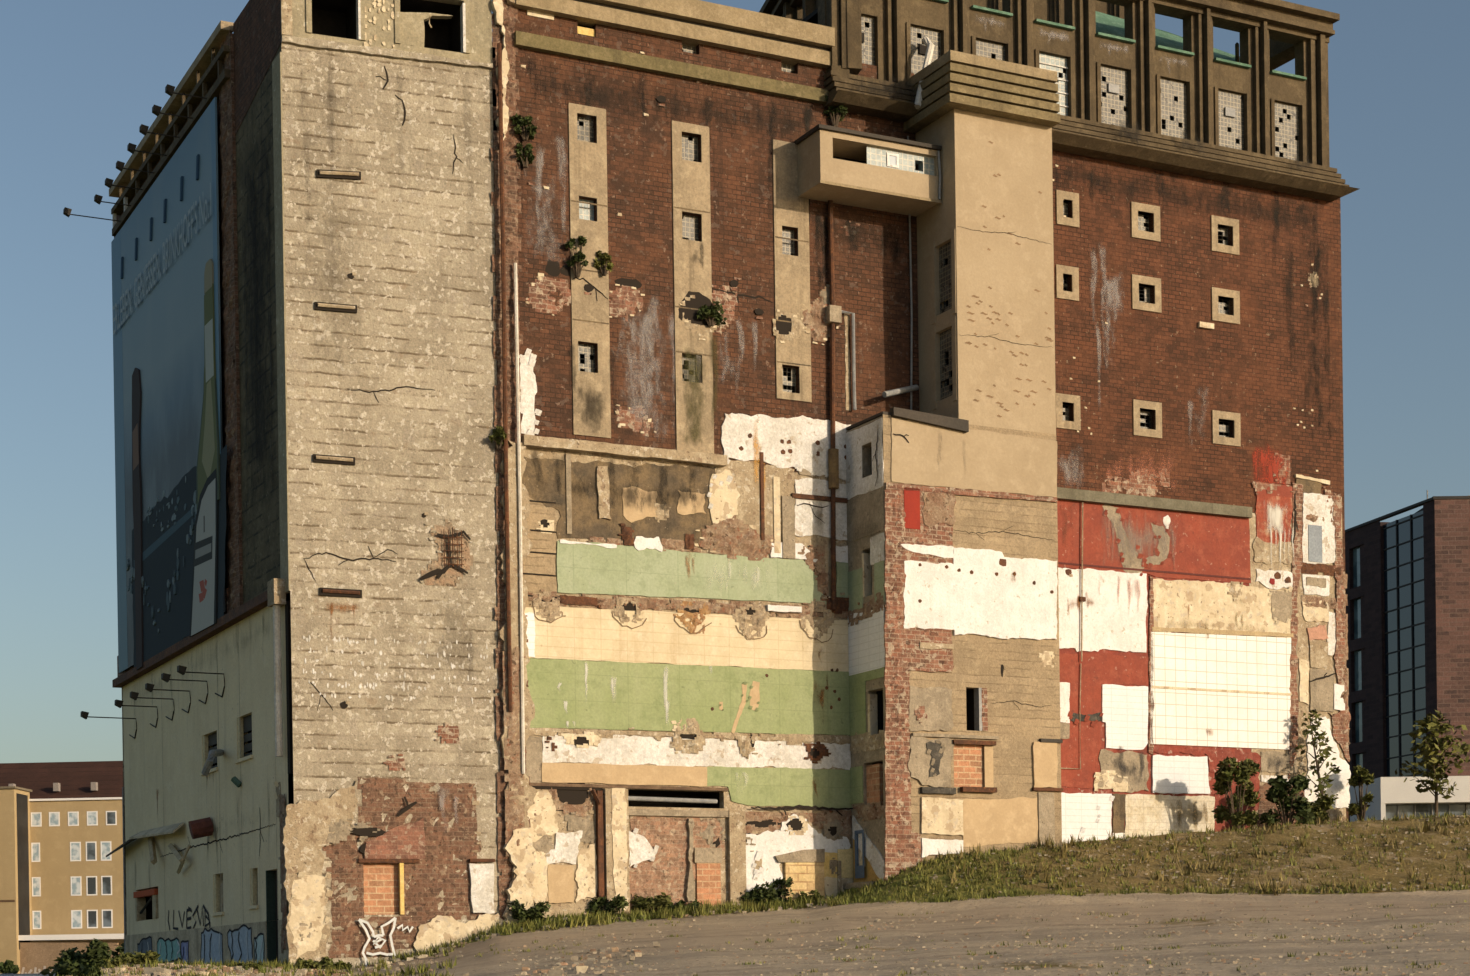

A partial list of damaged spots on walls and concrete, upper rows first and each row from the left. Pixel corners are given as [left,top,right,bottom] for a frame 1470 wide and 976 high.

spalling [525,259,645,321]
crack [303,530,471,581]
peeling [1102,468,1172,576]
flaking render [274,754,485,966]
flaking render [629,802,885,911]